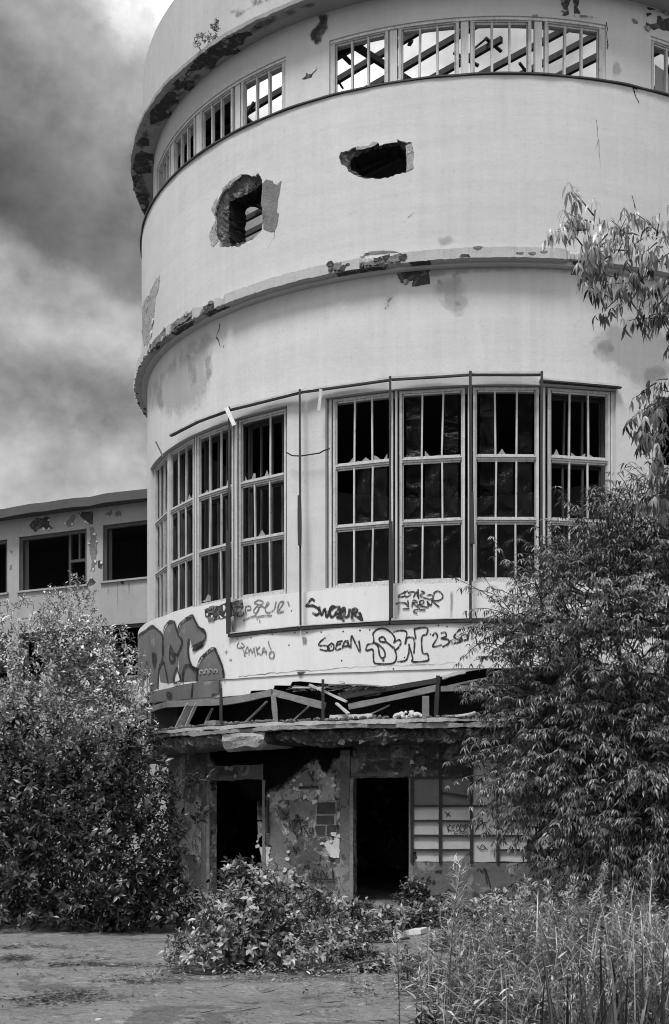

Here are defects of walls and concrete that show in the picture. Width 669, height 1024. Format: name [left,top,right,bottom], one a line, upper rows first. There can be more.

peeling [632,7,669,32]
peeling [356,139,414,172]
peeling [209,174,242,246]
peeling [261,179,281,232]
peeling [326,250,431,287]
peeling [138,275,178,368]
peeling [29,510,112,585]
peeling [255,772,340,872]